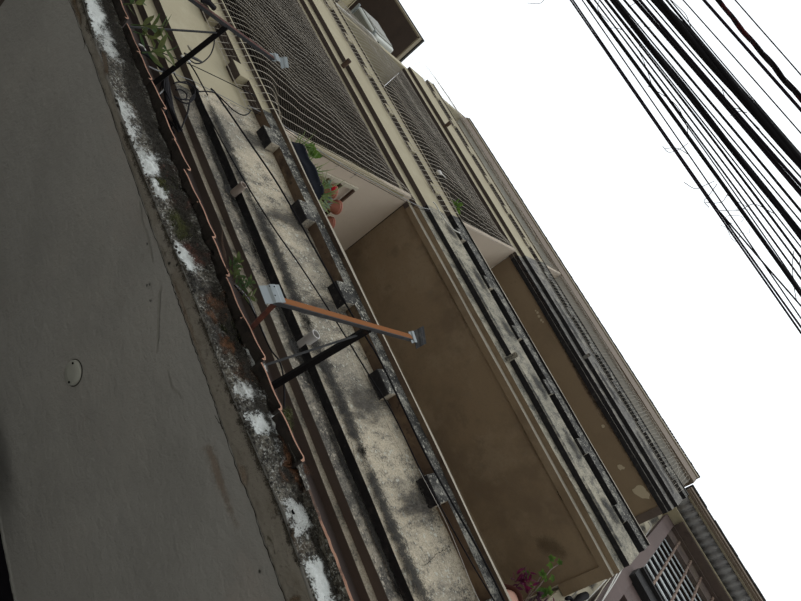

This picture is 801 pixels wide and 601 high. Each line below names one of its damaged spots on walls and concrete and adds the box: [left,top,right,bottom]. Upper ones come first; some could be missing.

crack [68,0,286,601]
damp [99,0,347,601]
damp [276,306,436,601]
peeling [632,485,650,499]